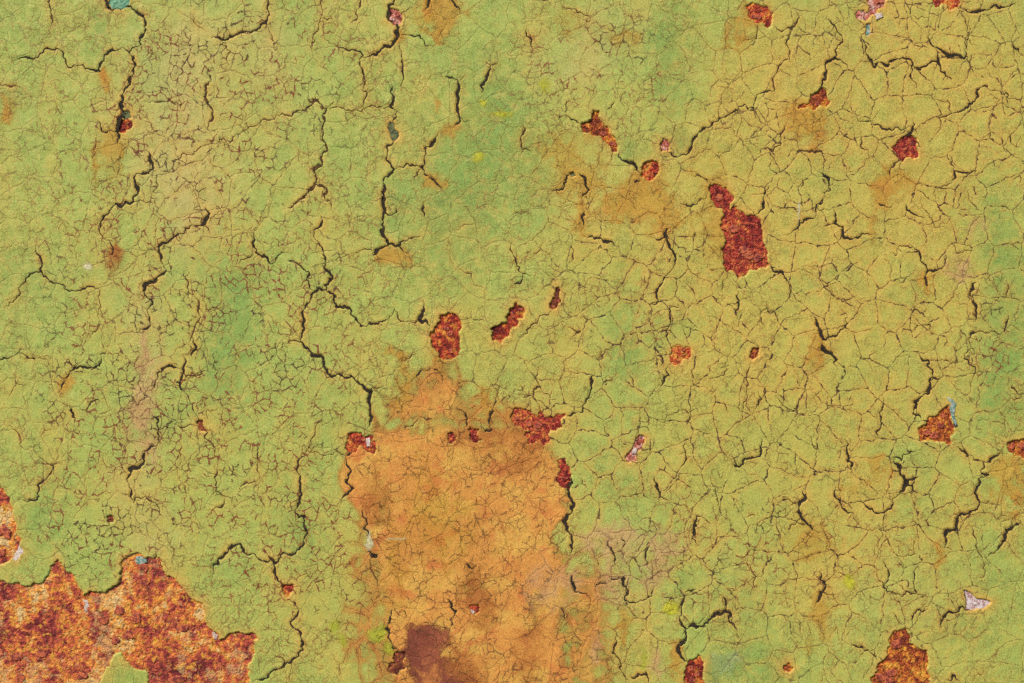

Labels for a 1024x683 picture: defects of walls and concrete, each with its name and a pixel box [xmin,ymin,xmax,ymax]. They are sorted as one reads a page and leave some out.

crack [13,0,156,188]
crack [820,3,1023,176]
crack [64,0,496,510]
crack [649,13,806,386]
crack [813,154,979,367]
crack [212,421,457,681]
corrosion [338,348,628,683]
crack [558,477,658,621]
peeling [625,435,644,462]
crack [676,589,738,662]
crack [833,446,1021,626]
peeling [964,591,990,610]